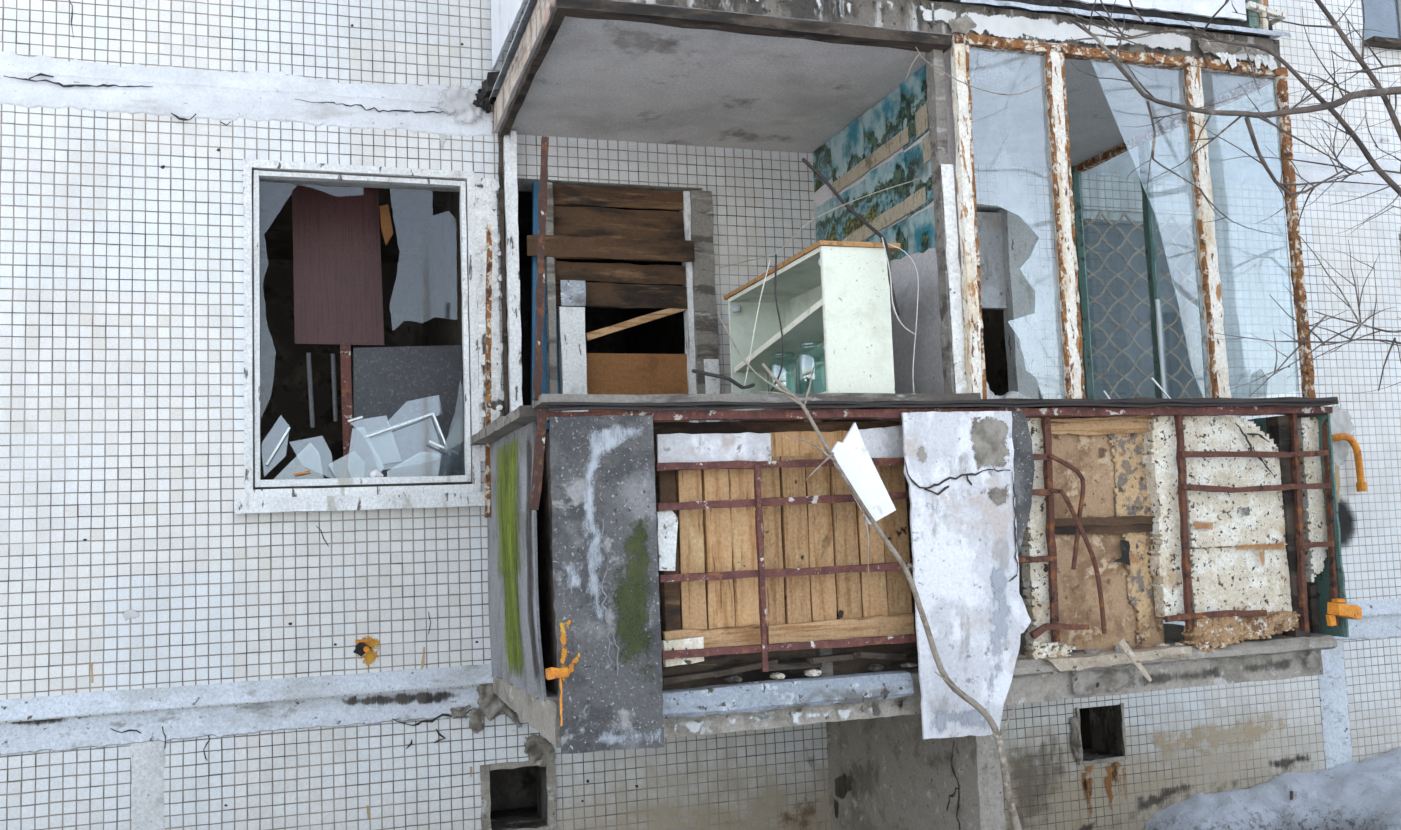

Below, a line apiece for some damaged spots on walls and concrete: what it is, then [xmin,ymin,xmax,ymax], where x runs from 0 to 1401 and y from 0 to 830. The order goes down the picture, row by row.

crack [3,73,231,126]
crack [295,99,456,114]
peeling [970,416,1010,506]
water stain [495,436,539,679]
water stain [567,425,640,618]
crack [905,462,1018,582]
spalling [450,683,556,767]
water stain [599,731,661,744]
corrosion [1082,762,1125,814]